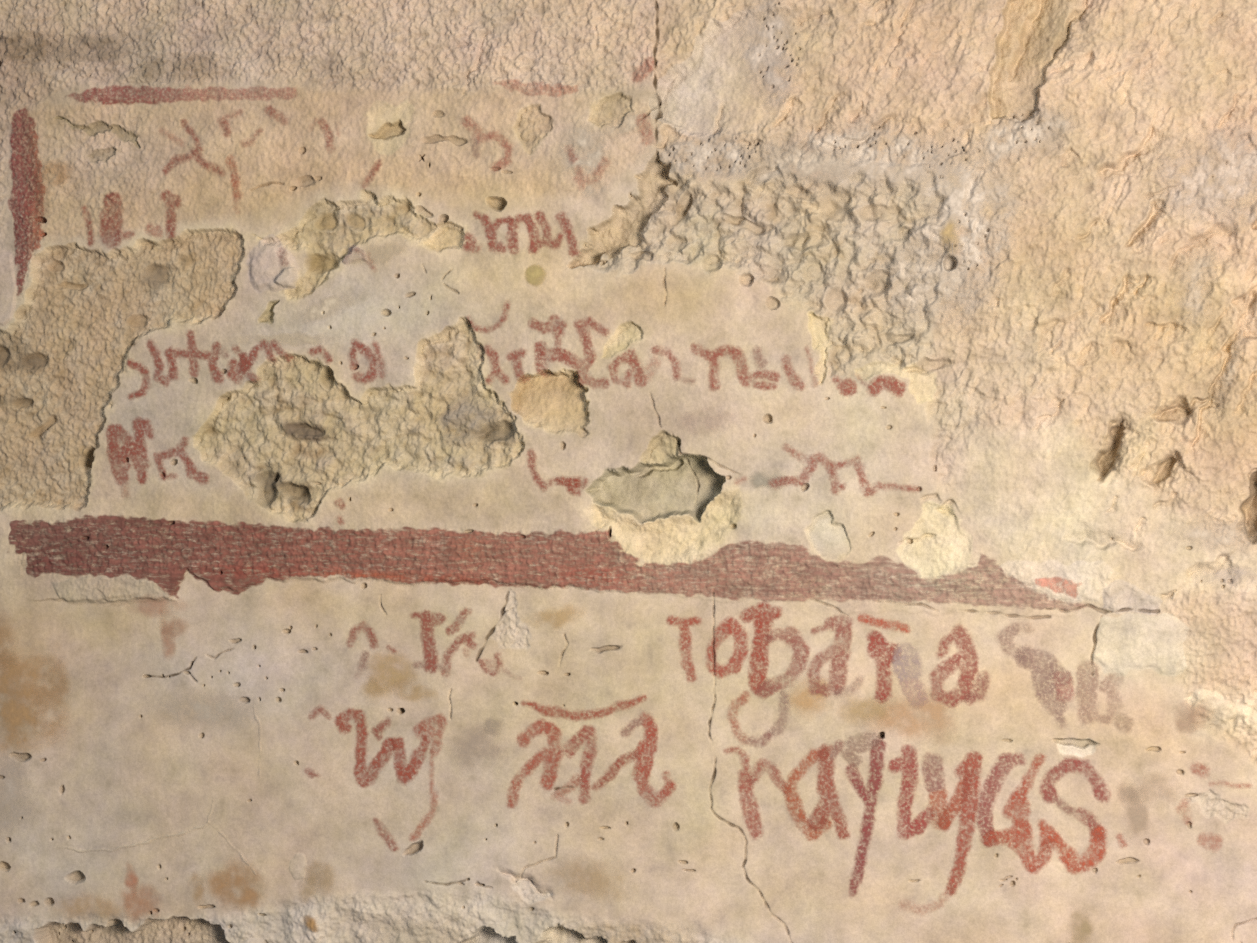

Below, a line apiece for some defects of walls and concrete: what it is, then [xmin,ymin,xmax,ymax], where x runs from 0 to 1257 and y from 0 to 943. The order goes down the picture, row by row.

crack [654,2,662,137]
spalling [986,0,1104,121]
spalling [566,150,963,406]
spalling [0,187,467,517]
spalling [190,315,592,526]
spalling [580,427,748,569]
spalling [892,486,976,583]
spalling [1090,414,1138,487]
spalling [1238,468,1257,547]
flaking render [996,556,1190,678]
spalling [17,897,233,943]
spalling [443,919,637,943]